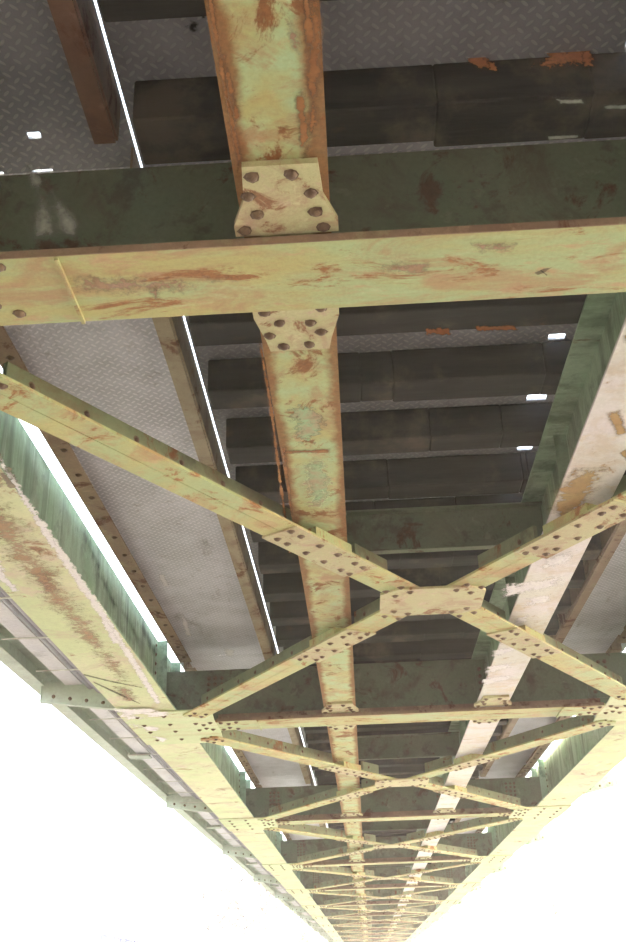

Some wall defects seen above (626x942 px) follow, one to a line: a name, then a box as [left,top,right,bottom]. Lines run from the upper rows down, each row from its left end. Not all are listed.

corrosion [290,0,322,154]
corrosion [468,57,497,71]
corrosion [531,51,594,68]
corrosion [260,343,329,519]
corrosion [0,508,132,701]